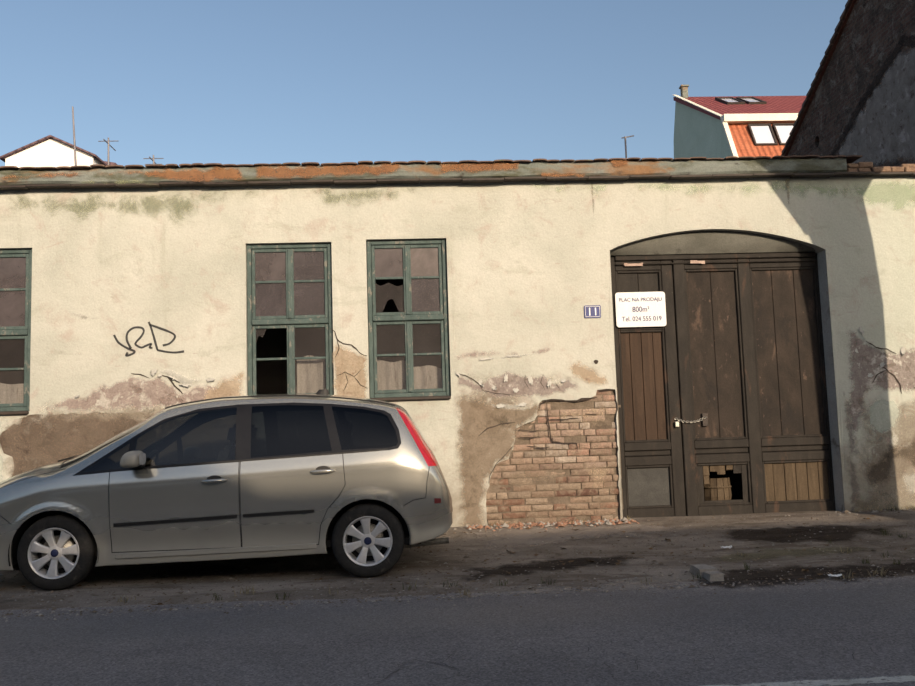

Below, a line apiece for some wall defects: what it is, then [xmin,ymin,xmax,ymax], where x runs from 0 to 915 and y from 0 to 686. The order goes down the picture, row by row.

crack [131,373,183,394]
crack [331,329,368,390]
flaking render [334,347,366,398]
crack [866,341,902,394]
flaking render [0,368,243,477]
spalling [456,365,623,526]
flaking render [850,327,915,503]